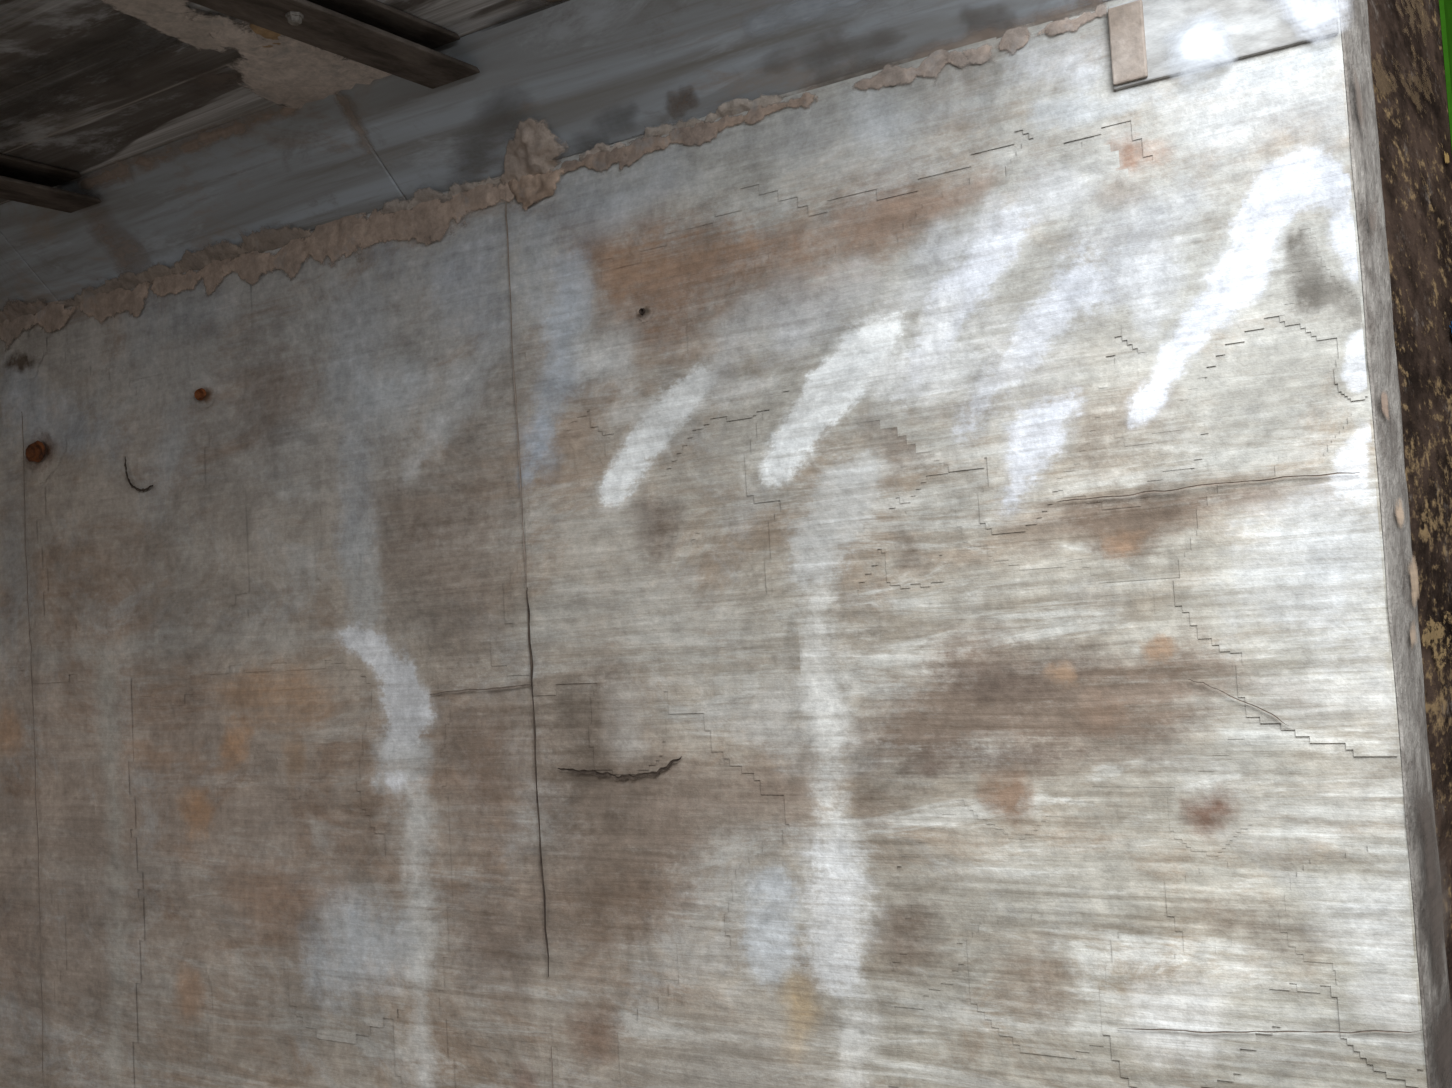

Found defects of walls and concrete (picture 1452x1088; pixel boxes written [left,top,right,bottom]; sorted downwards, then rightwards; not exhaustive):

spalling [101,0,391,109]
water stain [497,0,570,26]
spalling [854,4,1107,90]
water stain [1284,0,1344,34]
spalling [355,92,818,220]
spalling [0,225,311,323]
spalling [637,303,653,323]
water stain [590,17,1398,857]
crack [430,186,682,977]
water stain [0,13,1138,1088]
water stain [1416,793,1449,973]
water stain [967,845,1423,1088]